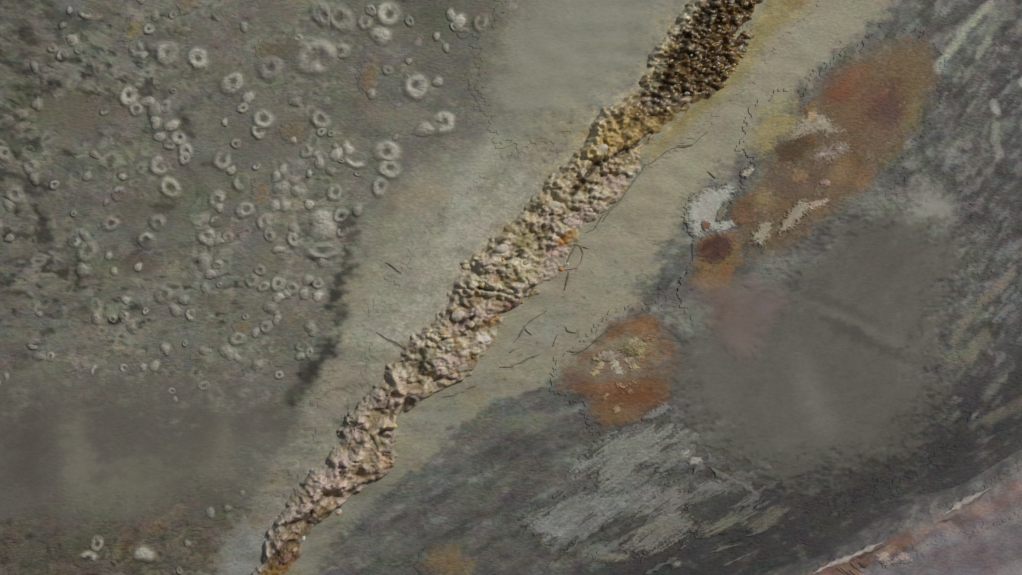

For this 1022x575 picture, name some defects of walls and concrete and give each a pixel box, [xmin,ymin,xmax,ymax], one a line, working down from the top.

crack [564,132,707,288]
rust [686,25,948,272]
crack [376,332,405,350]
crack [500,311,614,367]
rust [550,302,682,438]
spalling [806,522,922,575]